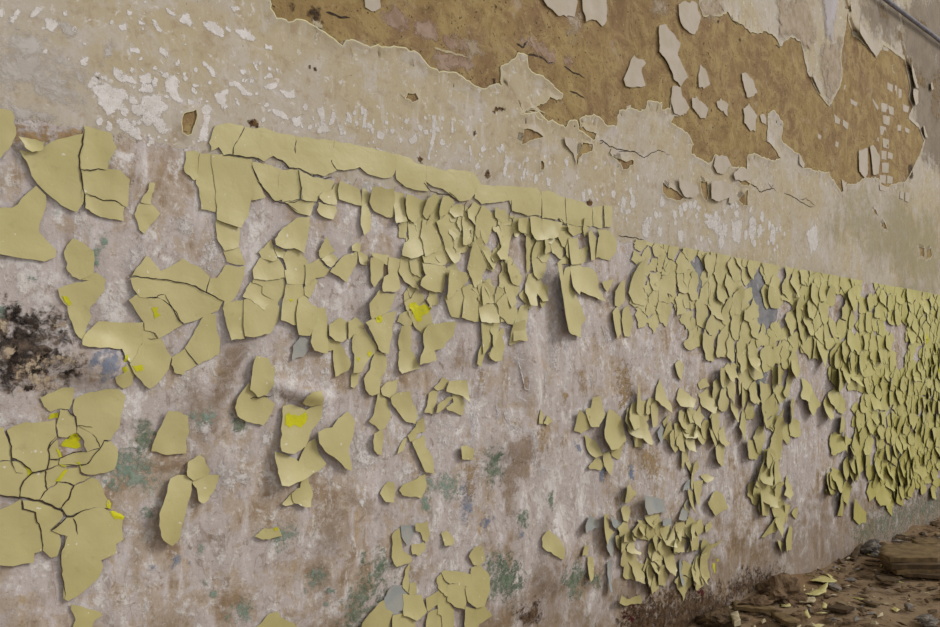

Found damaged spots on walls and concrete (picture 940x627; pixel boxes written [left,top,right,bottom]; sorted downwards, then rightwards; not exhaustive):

flaking render [256,0,928,211]
crack [0,409,110,596]
damp [0,293,123,397]
peeling [0,102,617,627]
peeling [619,595,642,606]
peeling [574,239,940,601]